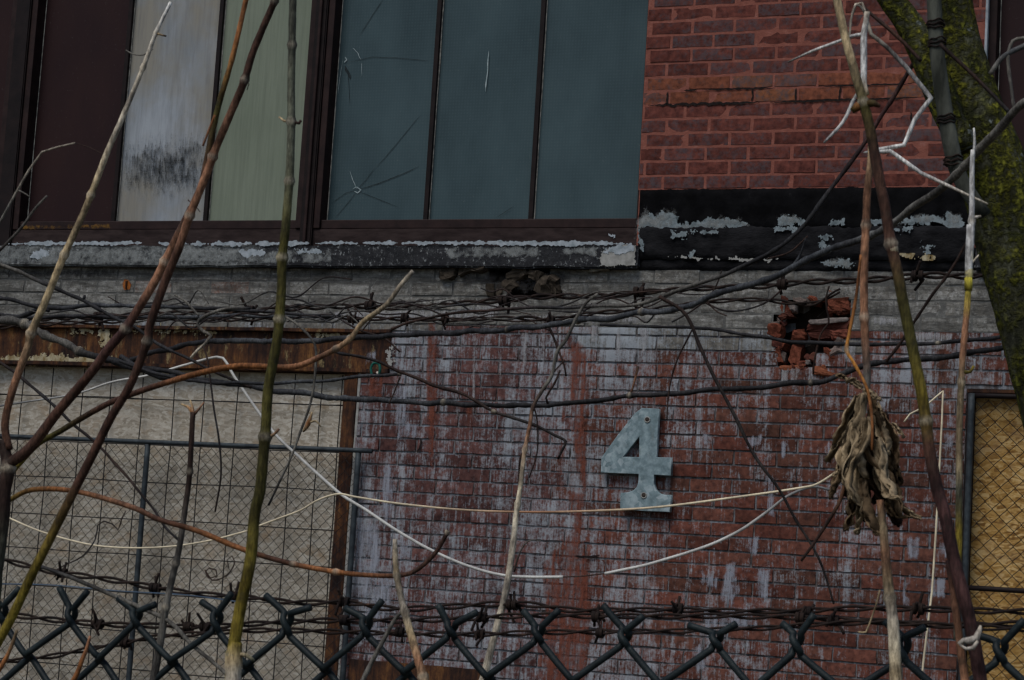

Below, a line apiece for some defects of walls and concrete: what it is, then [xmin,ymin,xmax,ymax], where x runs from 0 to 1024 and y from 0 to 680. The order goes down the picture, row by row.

crack [650,83,916,120]
peeling [773,214,805,233]
peeling [894,211,965,235]
spalling [179,210,748,297]
peeling [668,249,779,263]
peeling [818,218,856,268]
peeling [899,240,936,261]
spalling [766,290,857,376]